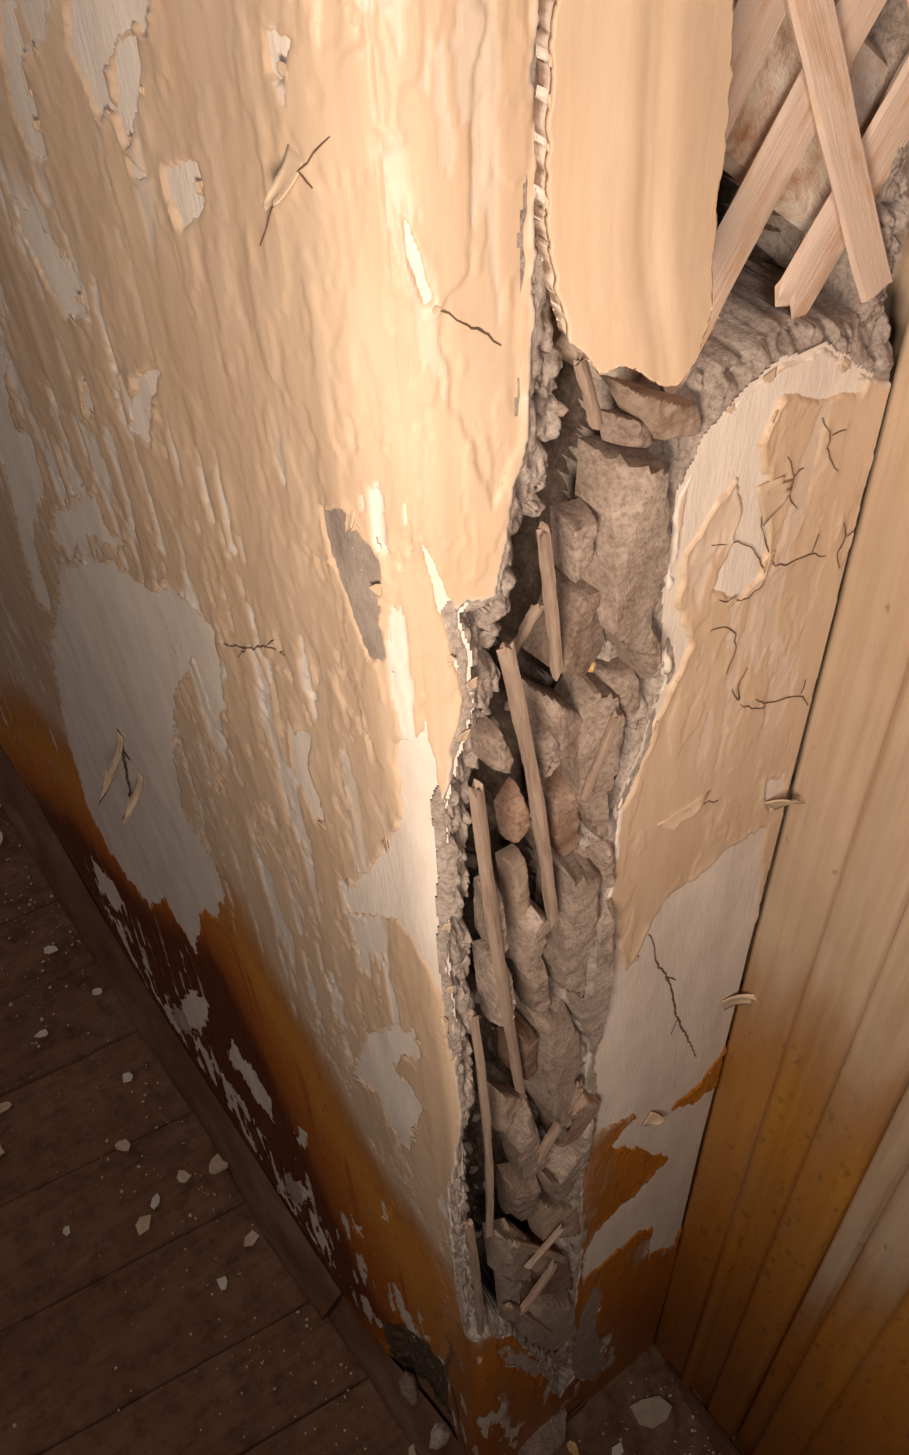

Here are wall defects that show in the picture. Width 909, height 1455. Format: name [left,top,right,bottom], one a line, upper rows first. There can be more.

peeling [1,0,50,159]
peeling [69,0,149,180]
peeling [268,29,290,80]
peeling [8,186,86,325]
peeling [166,159,205,227]
peeling [262,144,302,211]
peeling [323,506,394,673]
crack [711,418,855,709]
spalling [341,0,909,1415]
peeling [0,345,340,1277]
crack [648,934,696,1056]